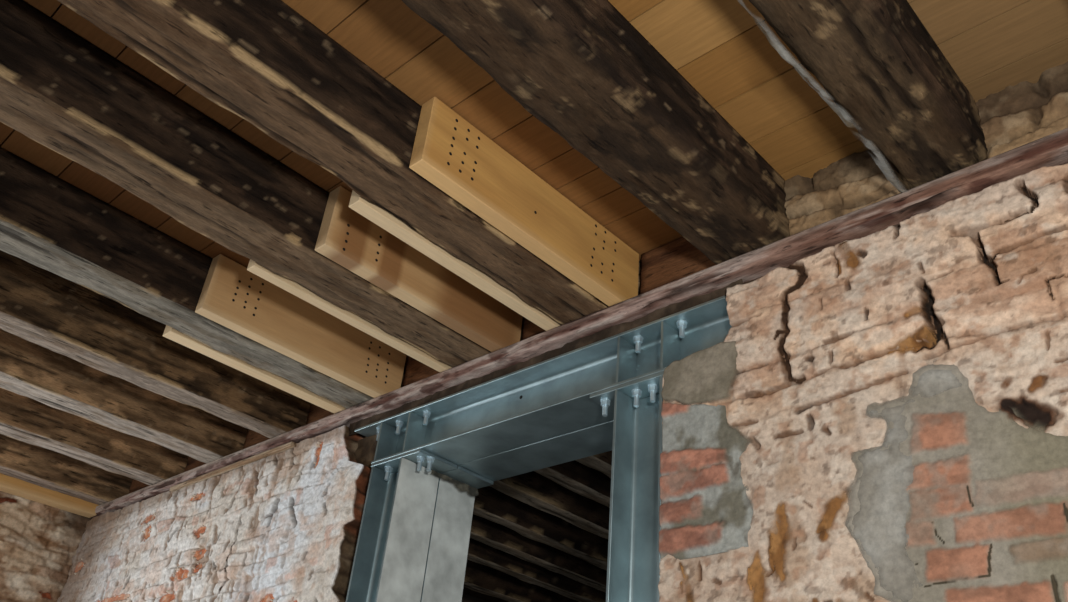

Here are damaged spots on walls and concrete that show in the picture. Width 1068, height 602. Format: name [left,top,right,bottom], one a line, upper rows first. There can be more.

crack [1005,187,1039,222]
crack [977,238,1005,285]
crack [774,265,808,384]
crack [917,283,949,352]
spalling [846,364,1068,602]